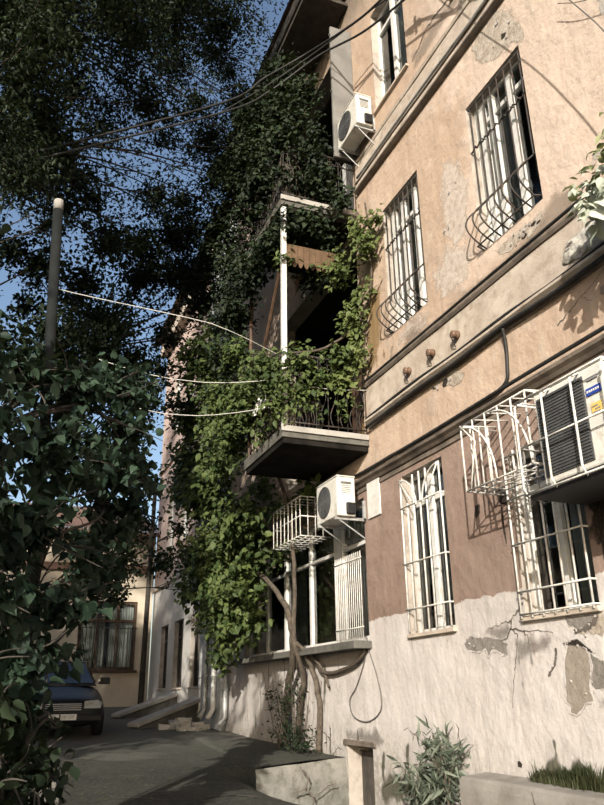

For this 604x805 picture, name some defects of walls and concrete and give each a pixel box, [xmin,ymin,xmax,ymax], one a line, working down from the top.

flaking render [472,9,524,63]
crack [557,268,604,326]
damp [588,499,604,556]
flaking render [465,627,508,659]
crack [491,602,553,708]
flaking render [548,612,604,717]